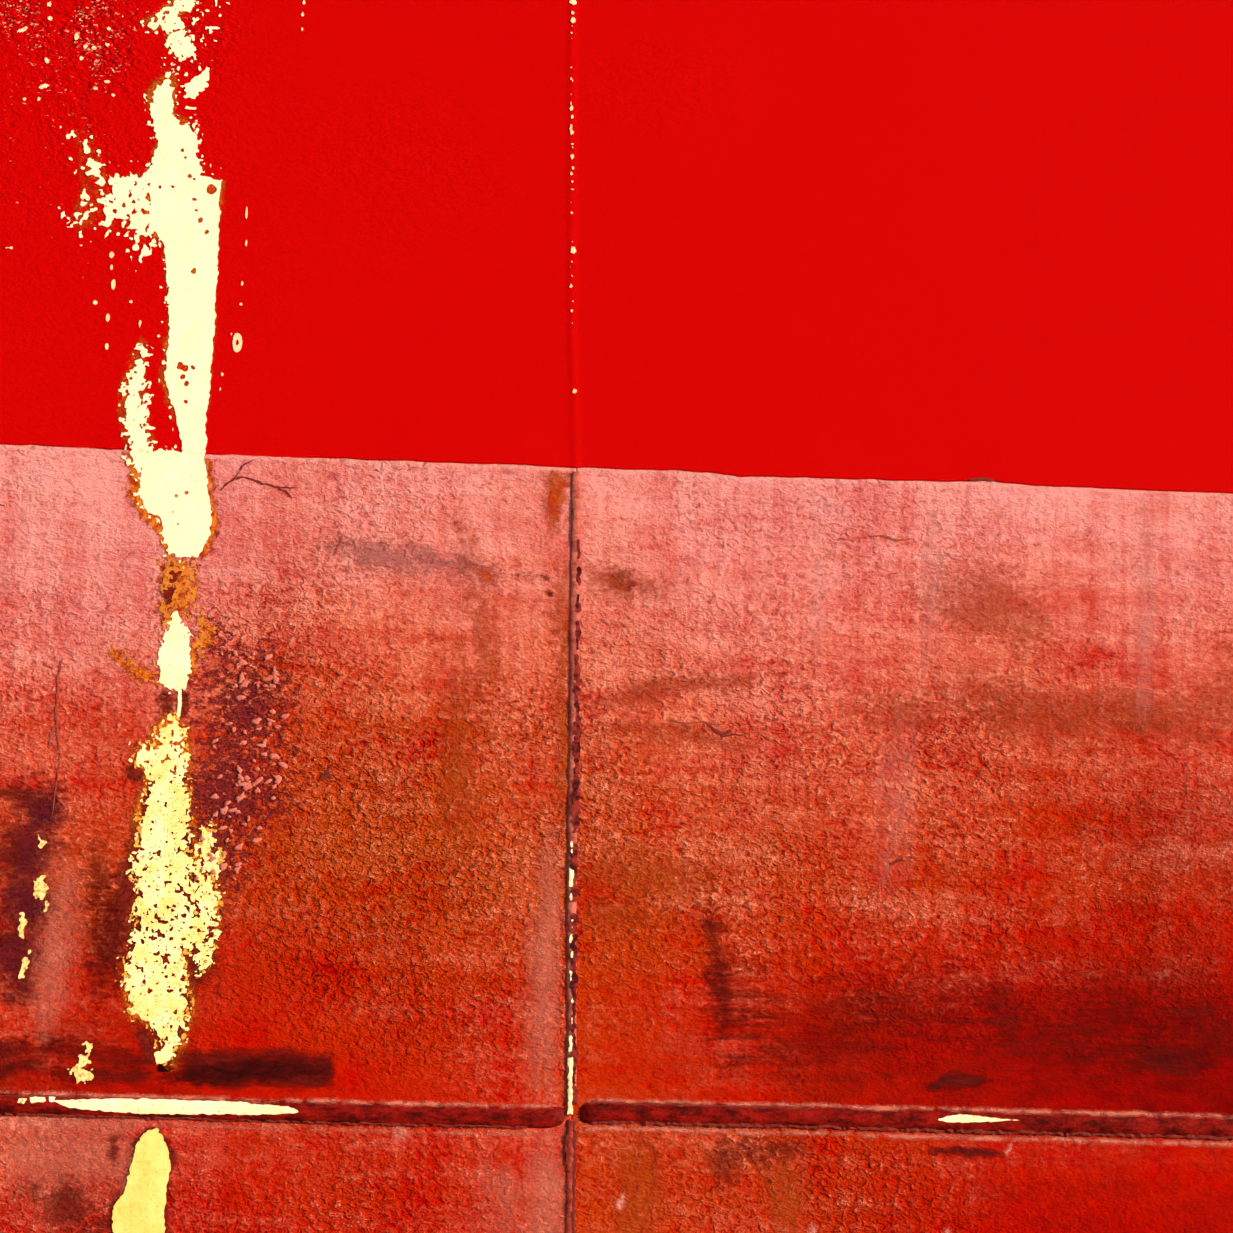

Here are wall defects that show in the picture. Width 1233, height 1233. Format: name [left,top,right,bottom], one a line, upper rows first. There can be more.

peeling [58,0,230,569]
peeling [231,333,242,352]
corrosion [103,549,218,718]
leakage [0,787,65,1002]
leakage [84,864,119,986]
corrosion [126,766,144,781]
peeling [102,611,228,1071]
peeling [67,1041,94,1084]
peeling [17,1096,298,1233]
peeling [938,1114,1016,1123]